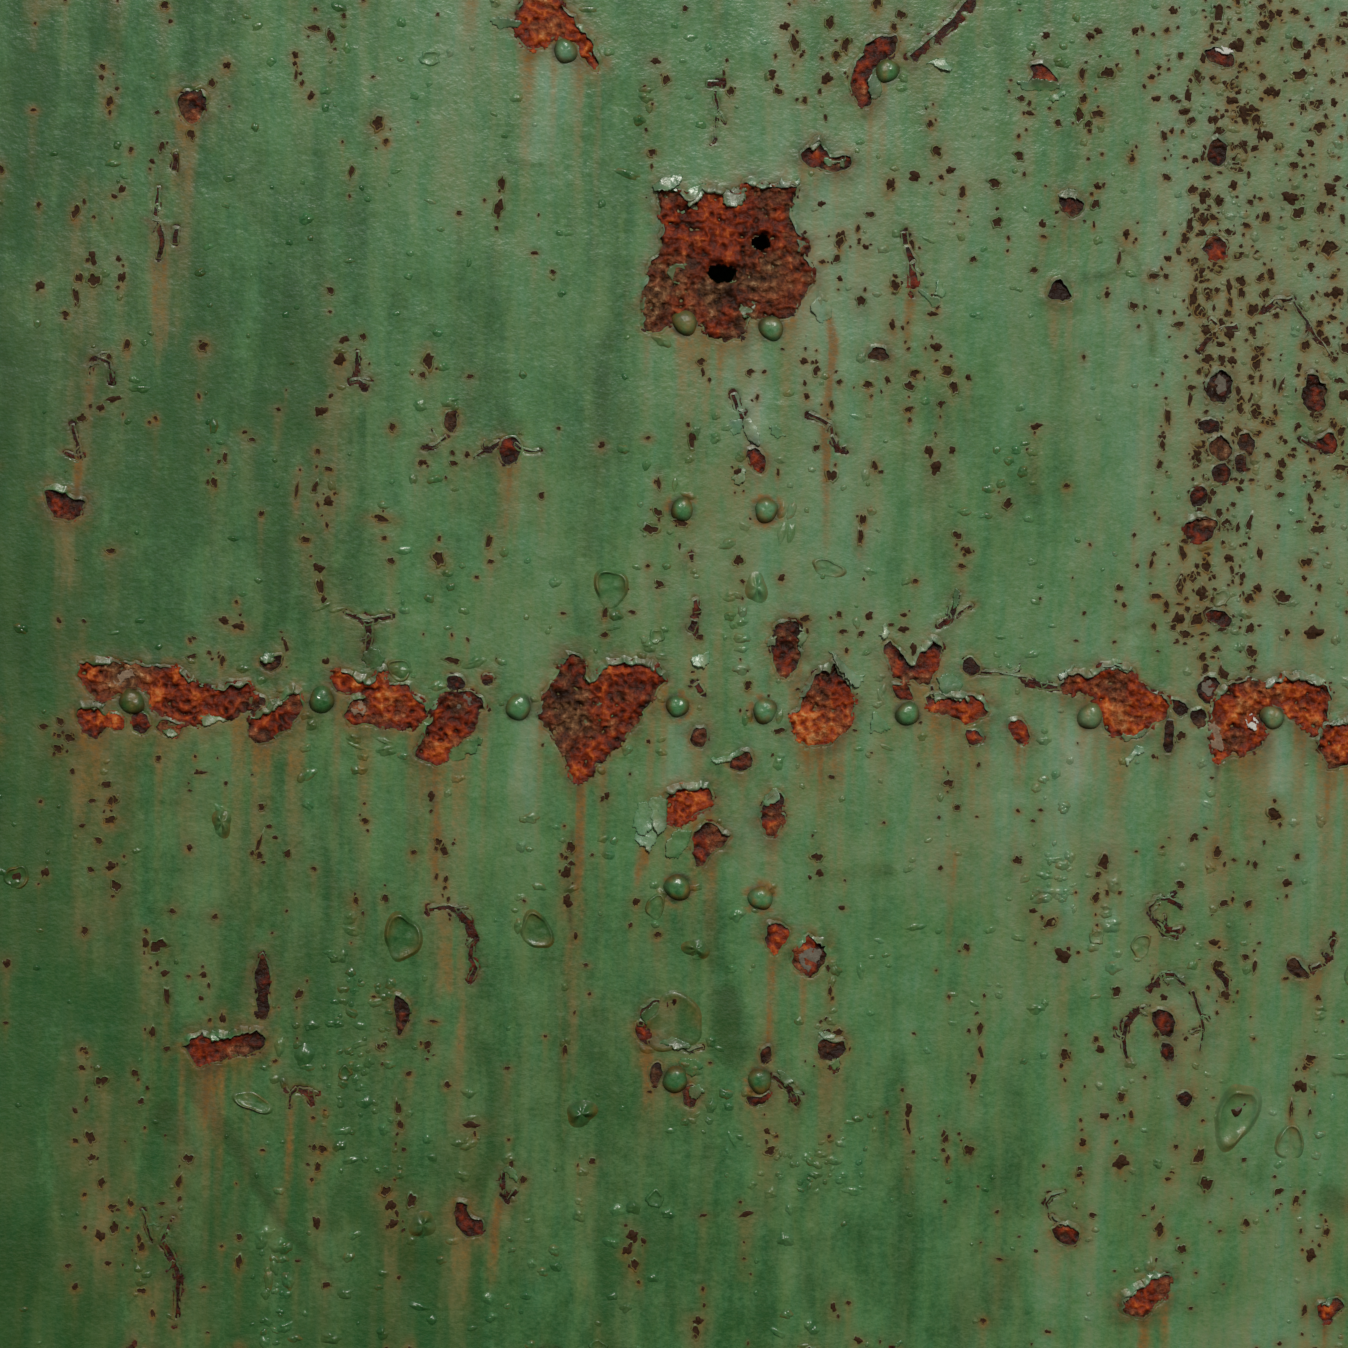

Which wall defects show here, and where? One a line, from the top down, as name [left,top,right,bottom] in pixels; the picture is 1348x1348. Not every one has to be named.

rust [46,162,132,472]
rust [148,61,232,210]
rust [291,50,316,101]
rust [490,0,602,115]
rust [778,0,799,34]
rust [1038,181,1106,239]
rust [535,8,1059,1143]
rust [35,483,306,1001]
rust [321,657,497,921]
rust [788,963,858,1178]
rust [47,1017,279,1348]
rust [1030,1206,1099,1348]